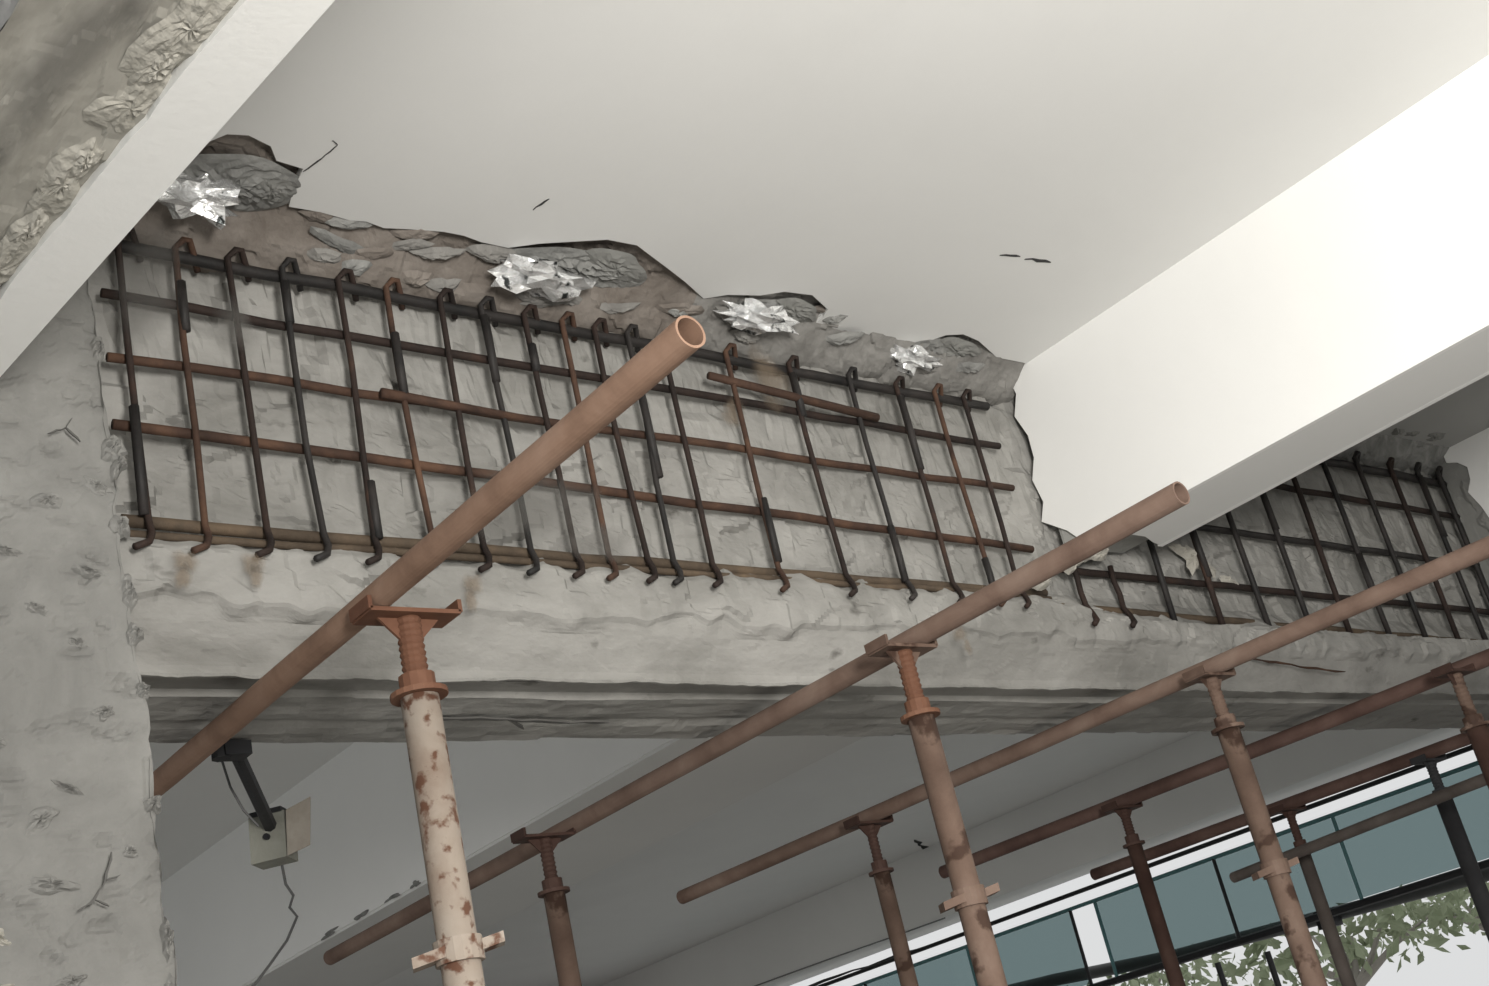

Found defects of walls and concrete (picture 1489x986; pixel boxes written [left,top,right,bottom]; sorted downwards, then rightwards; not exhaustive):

spalling [83,134,1034,602]
corrosion [759,360,782,396]
spalling [29,493,63,509]
spalling [0,544,24,557]
spalling [999,428,1489,640]
spalling [24,601,48,617]
spalling [71,564,144,647]
spalling [90,705,115,722]
spalling [25,780,84,835]
spalling [25,875,81,896]
spalling [159,916,174,986]
spalling [54,974,88,986]